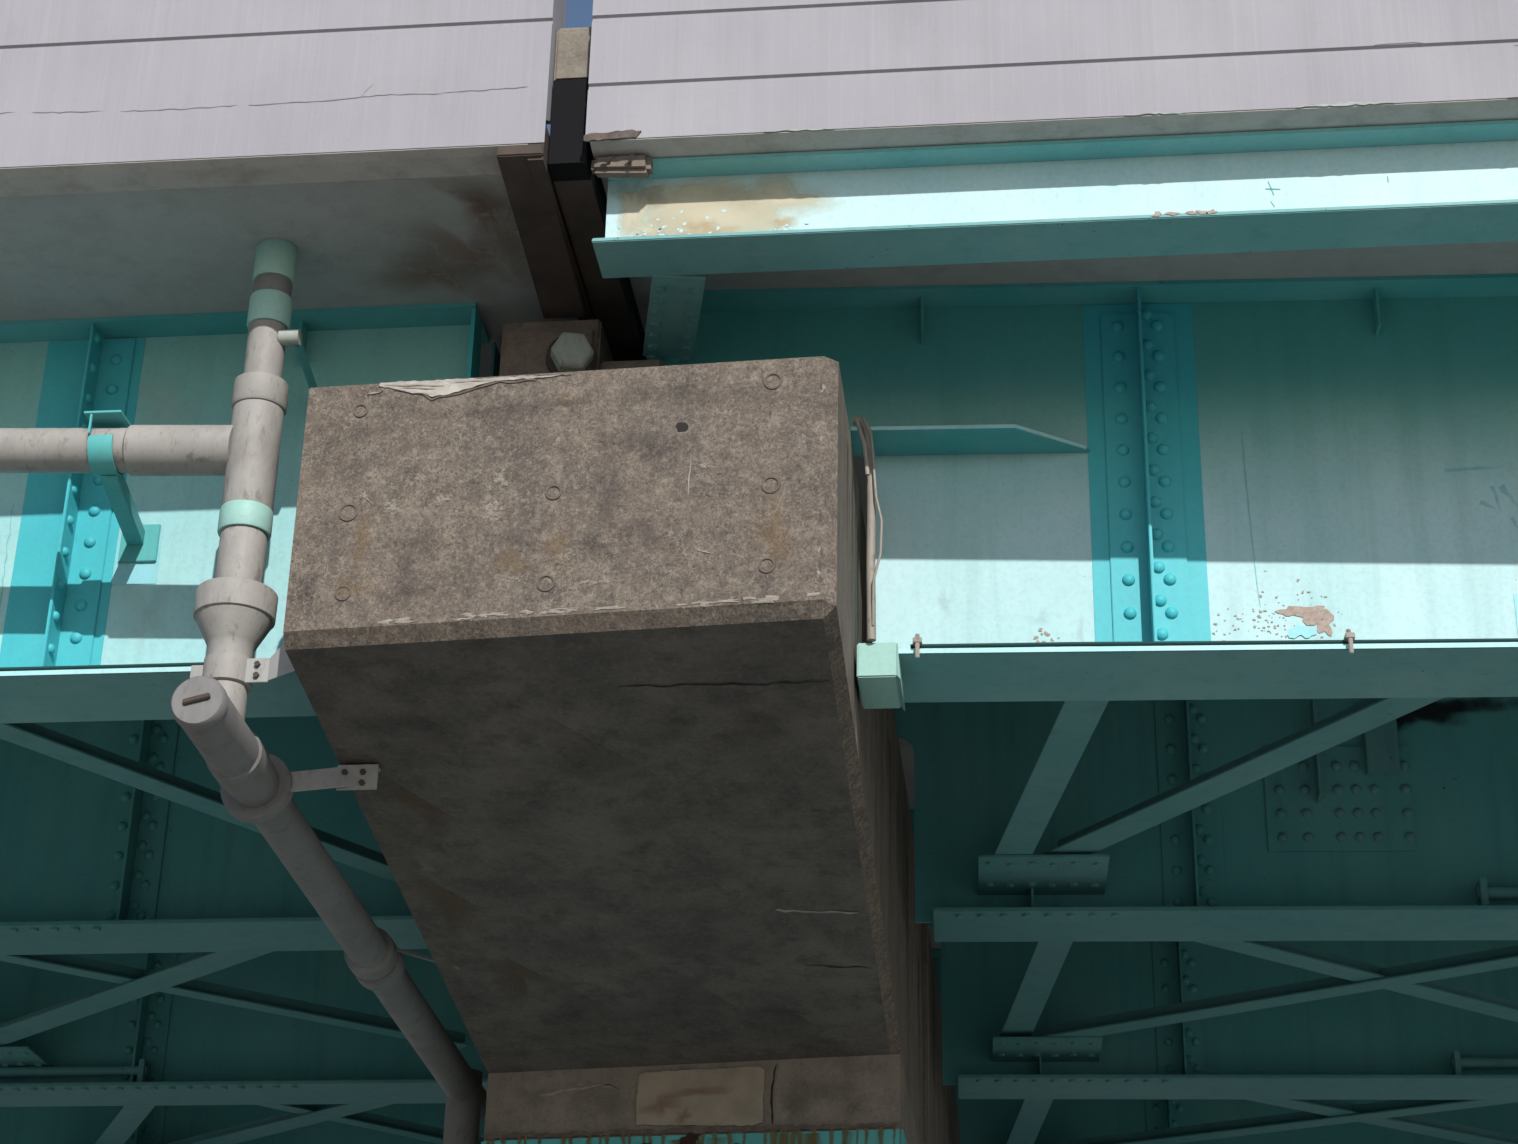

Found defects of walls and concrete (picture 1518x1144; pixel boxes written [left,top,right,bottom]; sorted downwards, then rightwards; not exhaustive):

crack [0,86,528,114]
rust [623,183,810,236]
spalling [367,374,571,401]
crack [621,679,829,687]
rust [482,1122,899,1144]